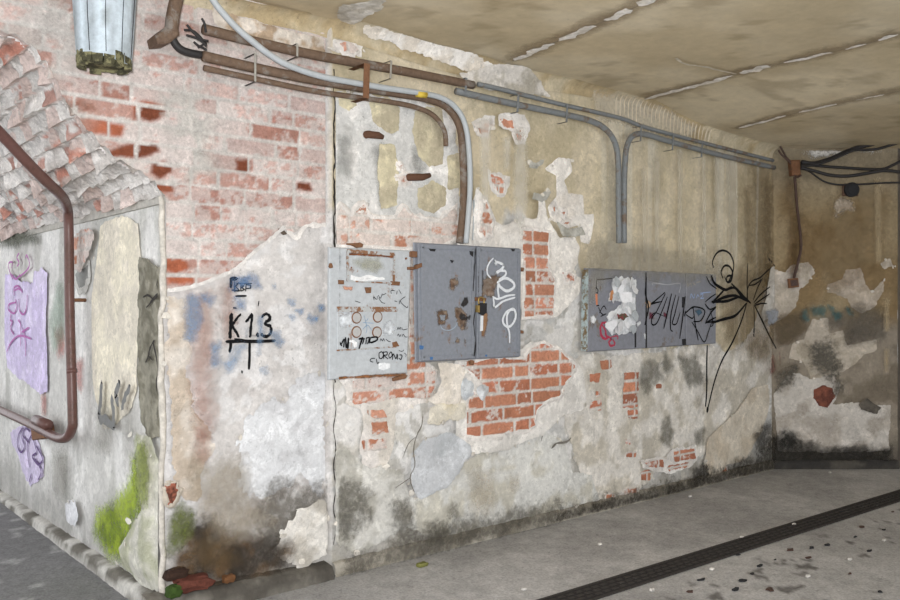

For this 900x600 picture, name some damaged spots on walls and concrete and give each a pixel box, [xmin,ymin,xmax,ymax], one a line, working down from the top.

flaking render [238,16,365,58]
crack [330,69,338,247]
flaking render [0,0,326,508]
flaking render [235,90,896,568]
damp [641,357,670,392]
damp [680,358,703,384]
damp [176,484,325,583]
crack [330,379,338,545]
damp [339,483,372,538]
damp [349,424,891,574]
damp [662,418,672,445]